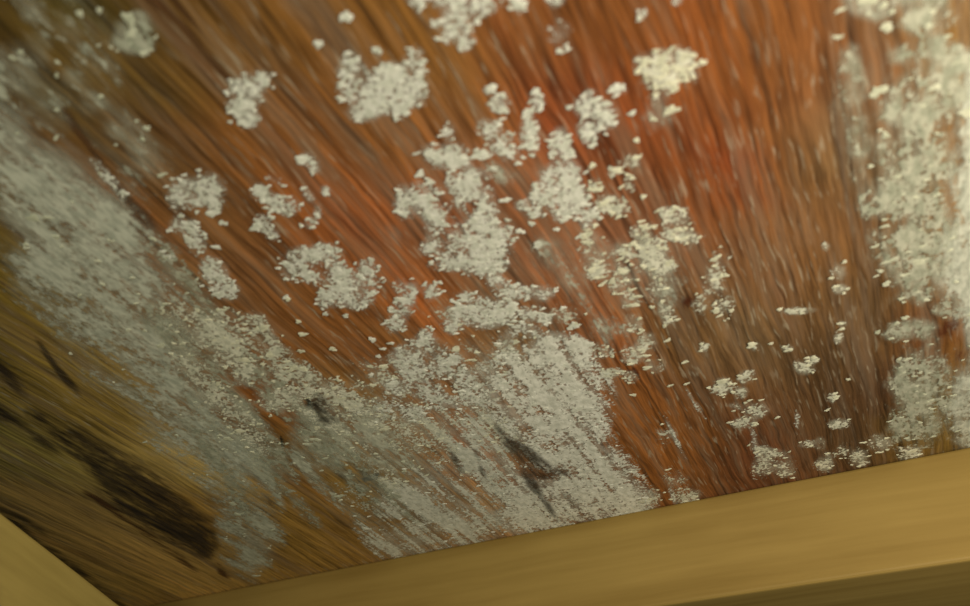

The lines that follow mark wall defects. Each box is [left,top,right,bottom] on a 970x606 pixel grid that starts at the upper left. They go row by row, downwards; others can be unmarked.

leakage [78,0,276,129]
leakage [339,11,354,23]
leakage [547,19,572,54]
leakage [799,0,970,473]
leakage [0,45,734,579]
leakage [746,342,820,374]
leakage [776,307,806,315]
leakage [706,370,796,480]